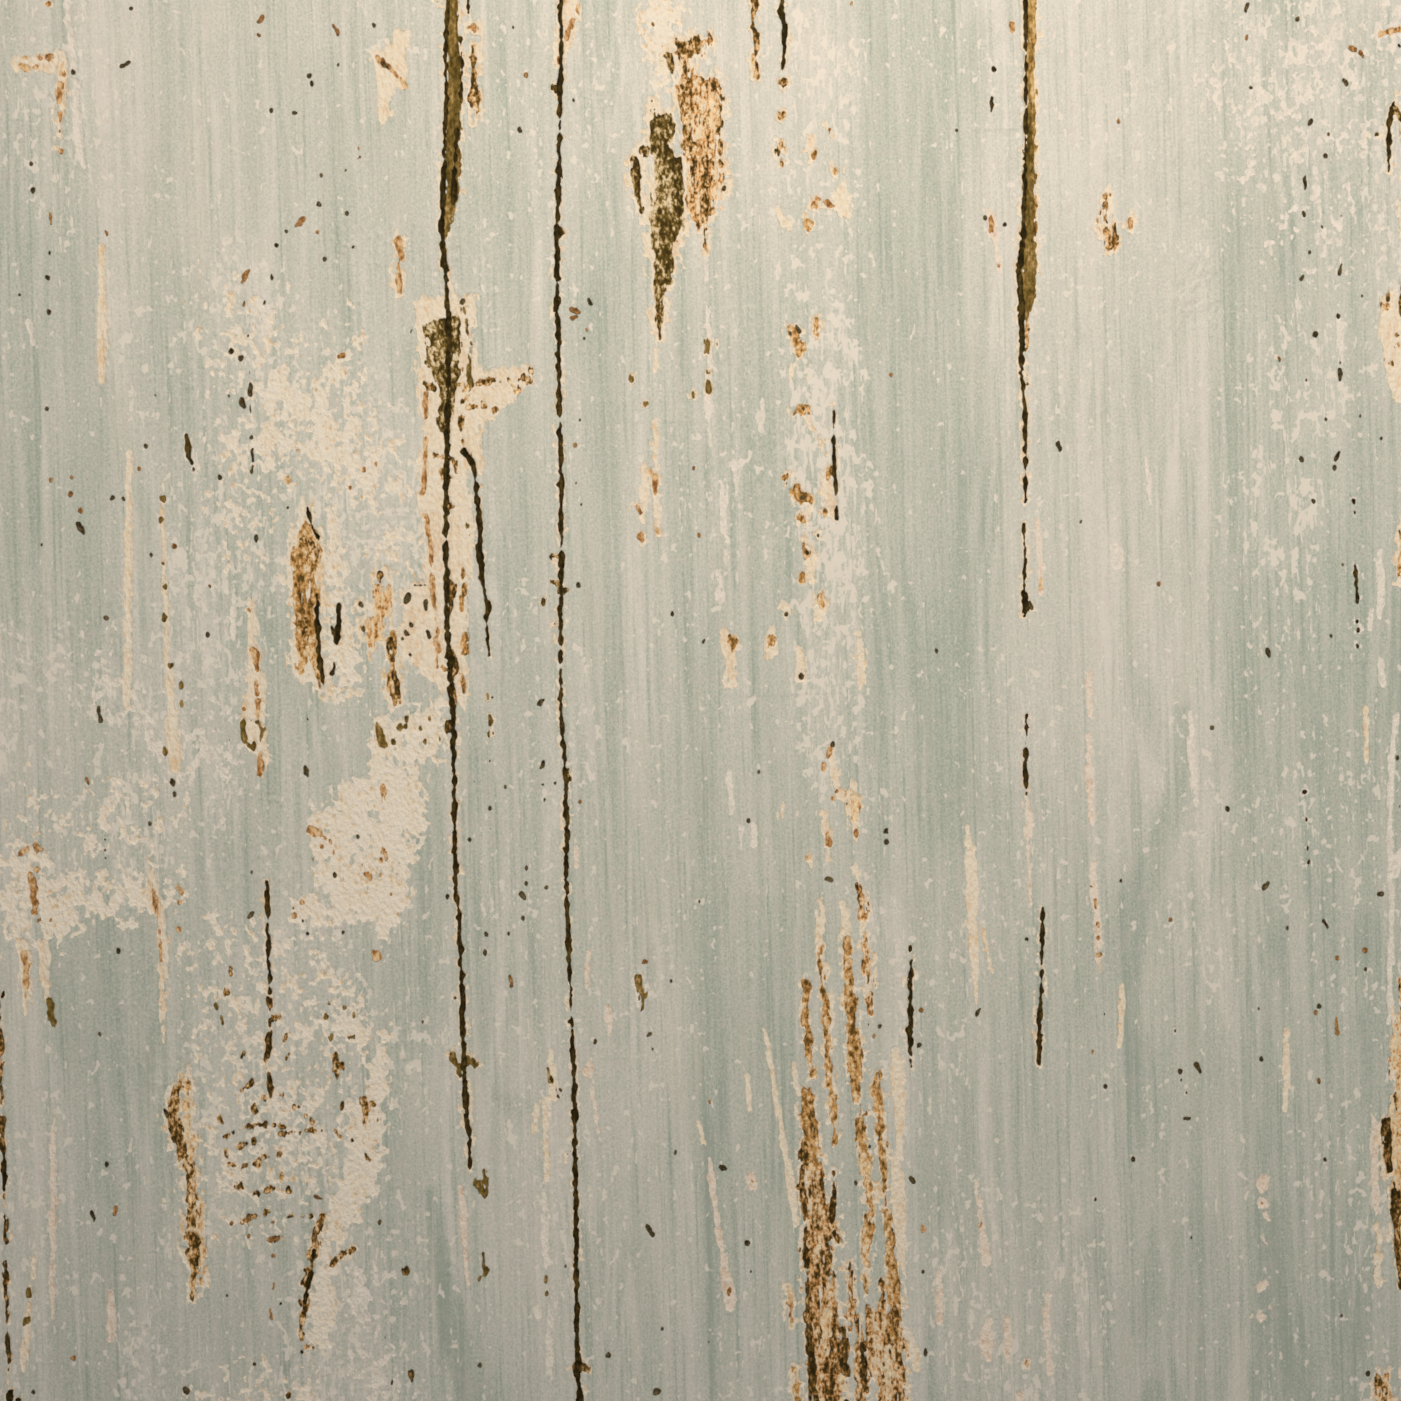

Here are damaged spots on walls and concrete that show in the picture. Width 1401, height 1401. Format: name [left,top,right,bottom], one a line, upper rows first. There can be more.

peeling [12,47,76,154]
peeling [274,201,322,247]
peeling [369,27,411,126]
crack [434,0,497,1173]
peeling [463,16,485,128]
crack [538,0,592,1401]
peeling [628,397,663,548]
peeling [623,0,734,386]
peeling [686,337,719,401]
crack [988,0,1043,619]
peeling [1190,0,1401,297]
peeling [779,741,928,1401]